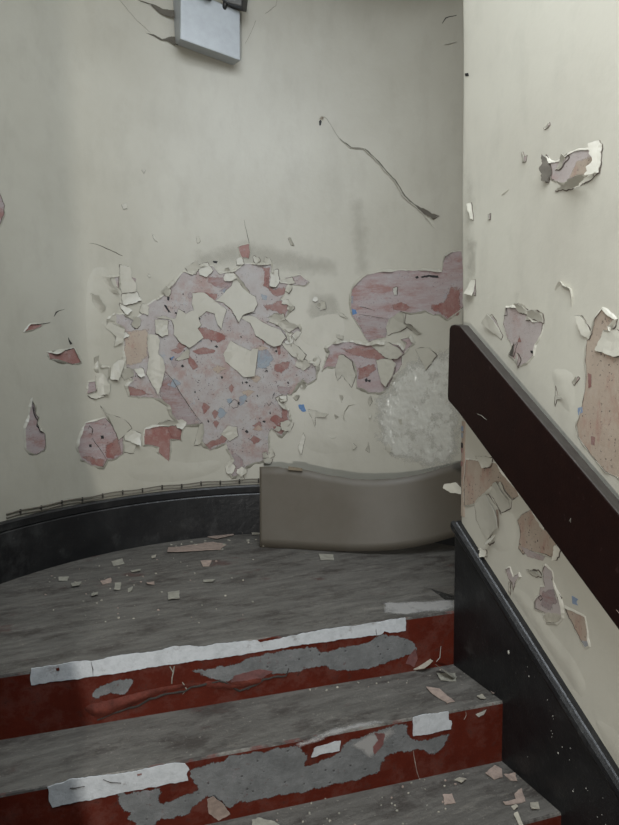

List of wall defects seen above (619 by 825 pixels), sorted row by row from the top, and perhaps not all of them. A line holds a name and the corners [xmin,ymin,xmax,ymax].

crack [325,117,439,229]
peeling [539,140,603,192]
peeling [46,338,82,365]
peeling [75,243,476,482]
peeling [481,303,545,368]
peeling [571,307,619,480]
peeling [443,421,521,560]
peeling [505,509,591,649]
spalling [92,679,133,699]
spalling [193,634,457,703]
spalling [118,724,450,825]
peeling [443,793,455,805]